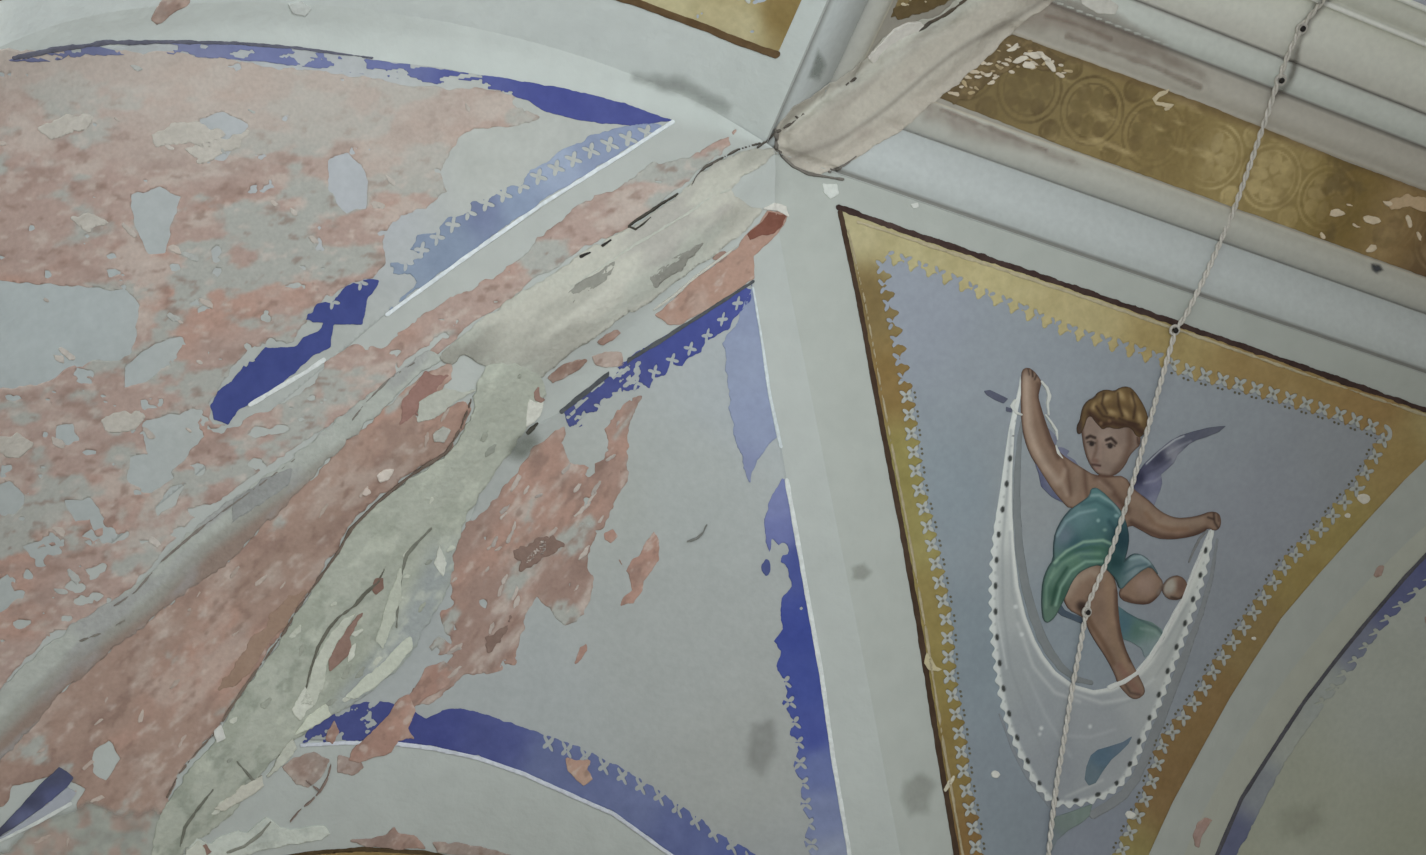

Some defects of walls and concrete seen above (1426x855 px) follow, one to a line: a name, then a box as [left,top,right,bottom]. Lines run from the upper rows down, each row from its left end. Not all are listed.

spalling [868,0,967,63]
peeling [948,43,1073,96]
crack [579,113,857,258]
peeling [653,203,789,325]
peeling [1330,201,1393,228]
peeling [0,48,737,855]